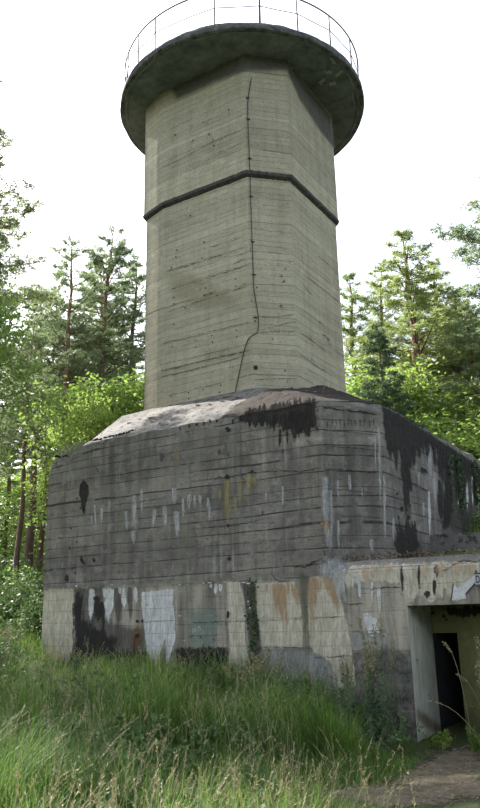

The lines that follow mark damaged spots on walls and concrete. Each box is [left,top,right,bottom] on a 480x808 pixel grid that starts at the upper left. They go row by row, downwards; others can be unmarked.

damp [153,494,210,532]
damp [323,404,480,611]
damp [79,587,145,668]
damp [176,646,228,669]